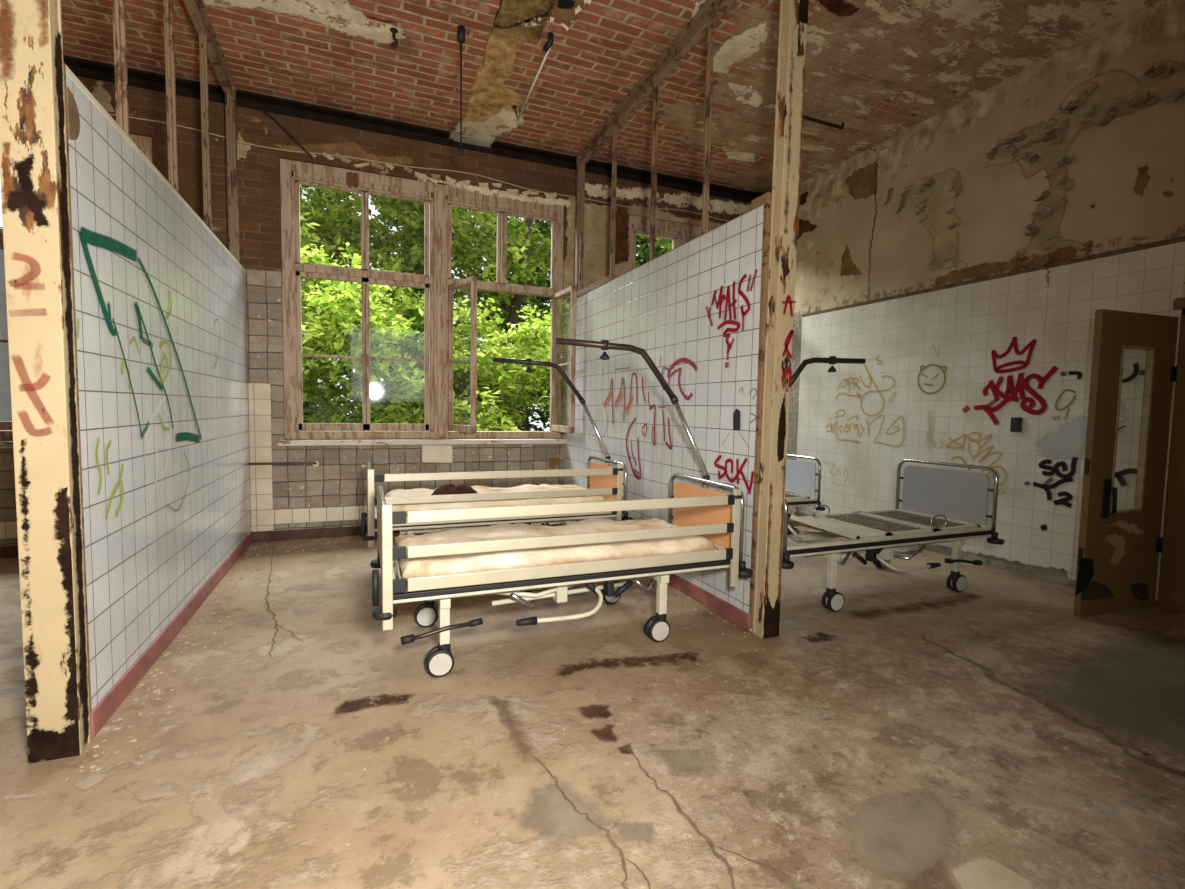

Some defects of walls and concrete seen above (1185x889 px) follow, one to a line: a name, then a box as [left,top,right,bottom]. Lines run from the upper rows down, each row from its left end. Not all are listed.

flaking render [203,0,410,44]
flaking render [713,20,768,109]
peeling [2,143,49,227]
flaking render [449,108,525,148]
flaking render [575,177,751,264]
peeling [784,52,817,240]
peeling [846,60,1185,285]
peeling [777,400,786,462]
crack [264,546,303,656]
crack [920,635,1185,777]
crack [535,757,651,889]
crack [626,747,782,889]